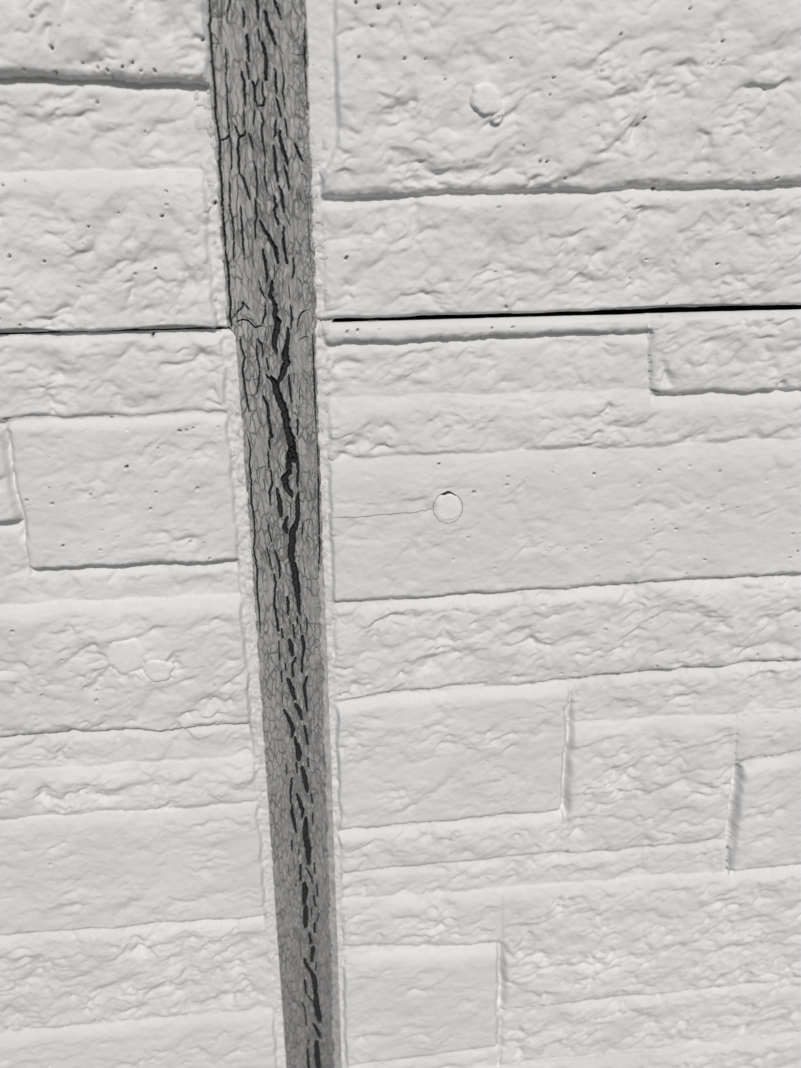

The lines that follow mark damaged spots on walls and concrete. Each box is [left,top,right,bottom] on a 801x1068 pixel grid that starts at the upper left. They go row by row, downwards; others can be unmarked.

crack [208,0,435,1068]